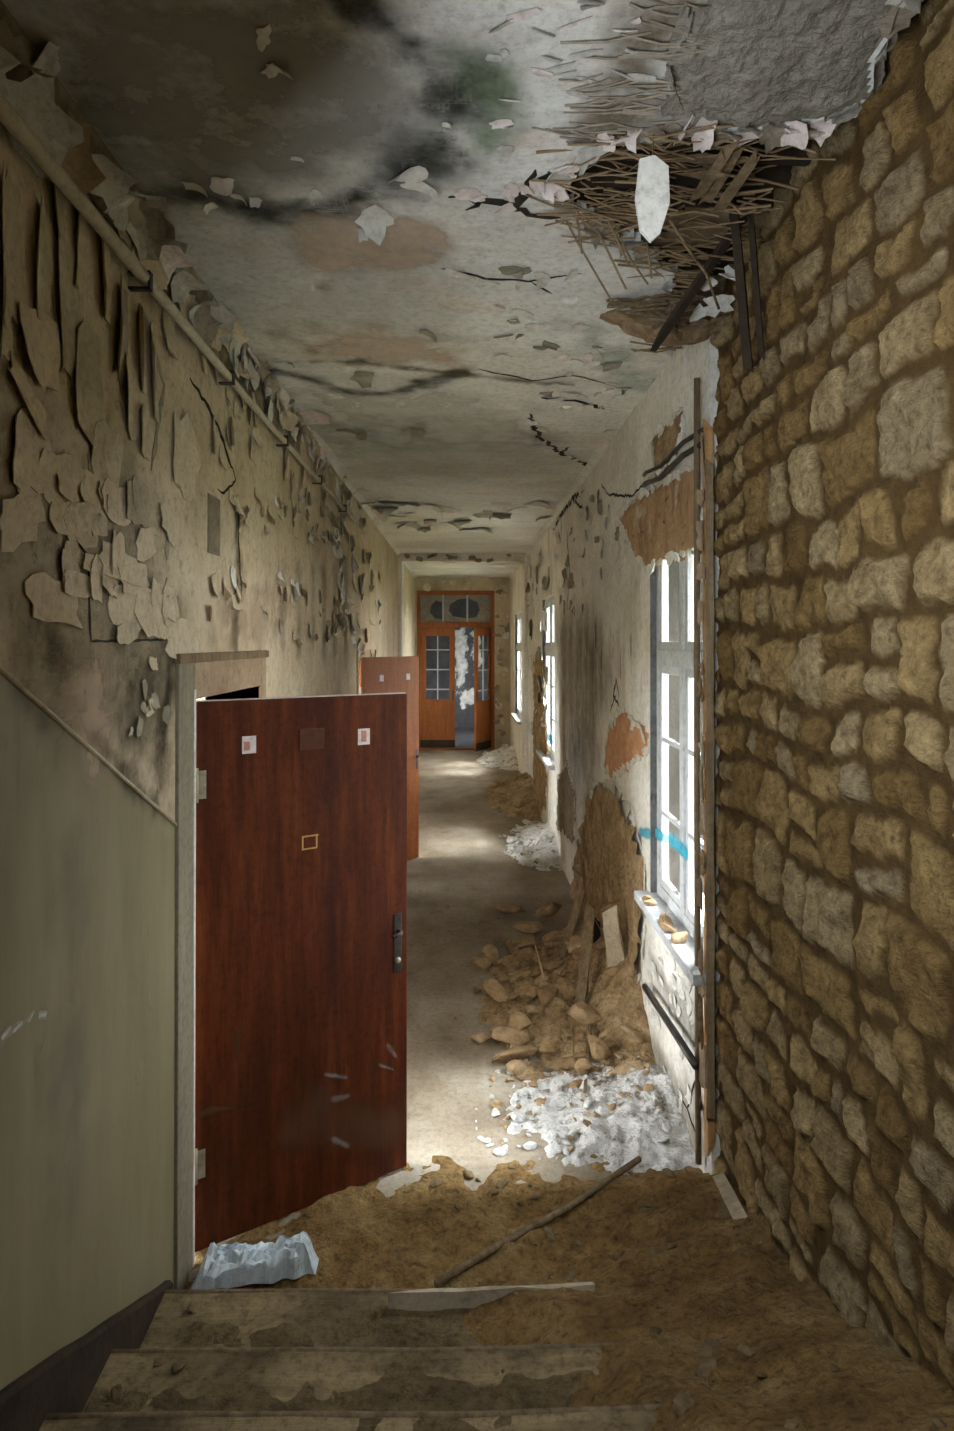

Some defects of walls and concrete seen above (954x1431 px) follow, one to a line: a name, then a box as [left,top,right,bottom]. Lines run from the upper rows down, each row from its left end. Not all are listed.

water stain [62,0,408,221]
peeling [0,17,707,1117]